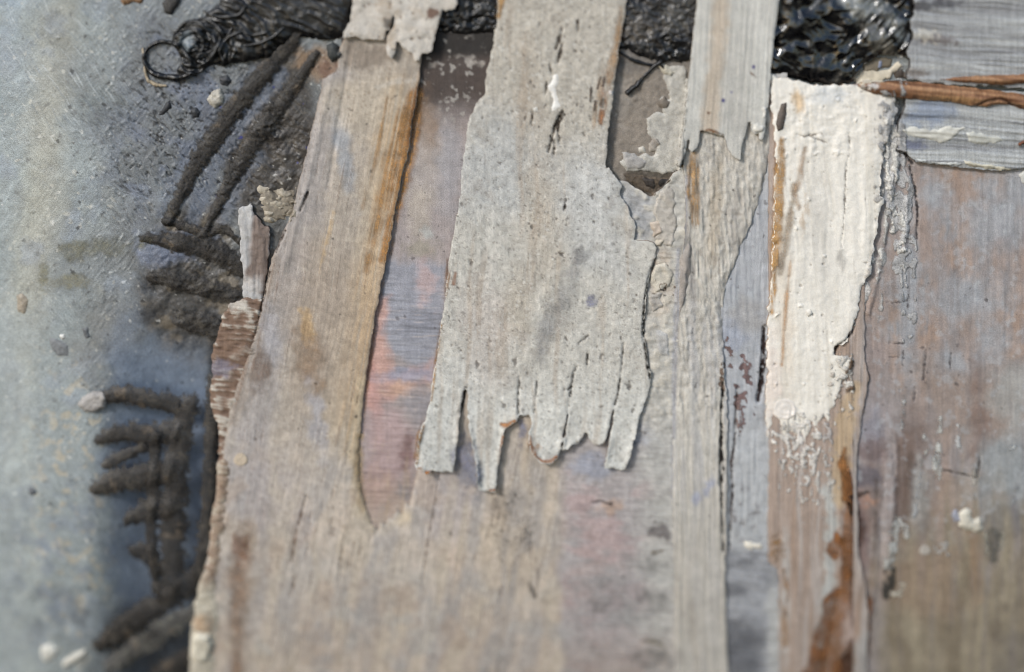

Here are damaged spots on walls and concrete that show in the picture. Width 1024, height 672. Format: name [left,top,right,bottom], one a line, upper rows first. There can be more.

spalling [547,74,560,111]
crack [615,262,654,405]
peeling [620,64,688,246]
peeling [650,262,676,312]
rust [770,138,796,314]
peeling [854,56,1024,343]
rust [803,444,869,672]